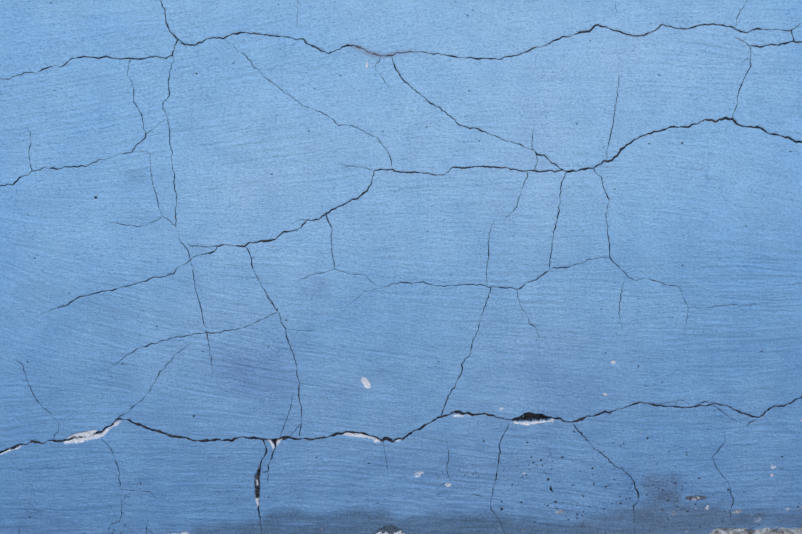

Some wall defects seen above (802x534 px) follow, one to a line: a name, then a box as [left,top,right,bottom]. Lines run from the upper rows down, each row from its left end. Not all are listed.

crack [0,1,802,331]
crack [117,125,434,368]
crack [0,360,82,453]
spalling [63,421,121,444]
crack [91,323,643,532]
spalling [513,412,554,426]
crack [649,396,802,425]
spalling [374,525,405,534]